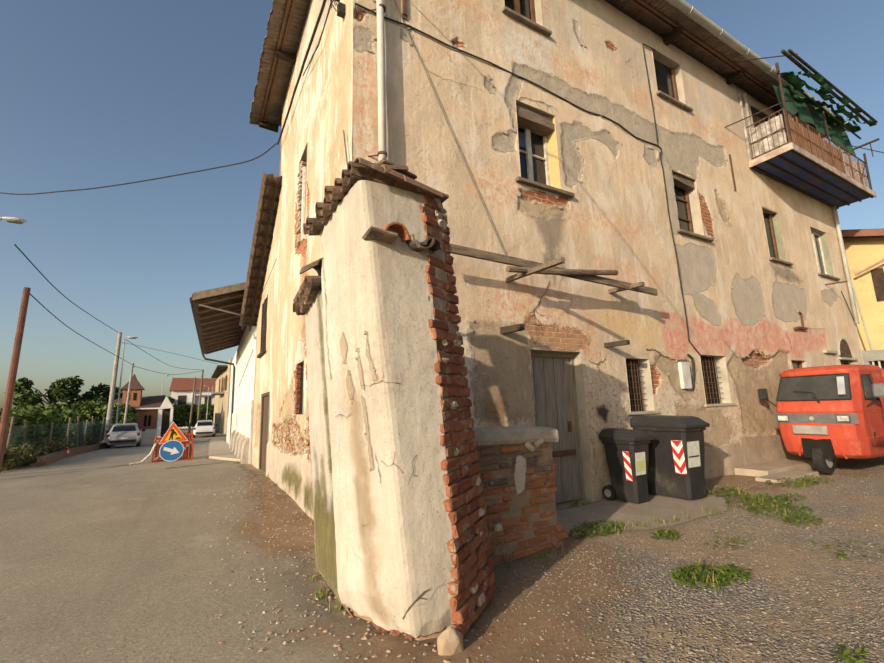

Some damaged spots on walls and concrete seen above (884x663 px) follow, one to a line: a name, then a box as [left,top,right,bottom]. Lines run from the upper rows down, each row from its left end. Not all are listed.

peeling [484,63,728,188]
flaking render [294,181,310,257]
spalling [516,190,570,220]
spalling [697,186,730,241]
flaking render [272,343,311,461]
crack [375,452,417,484]